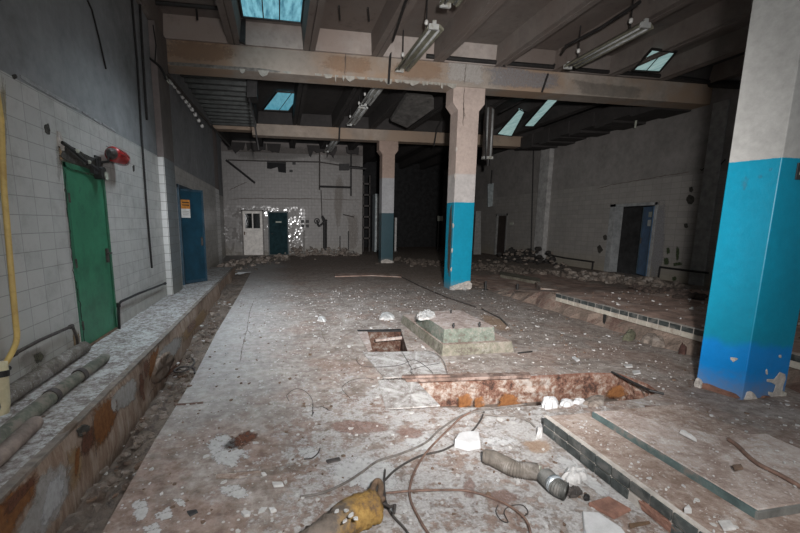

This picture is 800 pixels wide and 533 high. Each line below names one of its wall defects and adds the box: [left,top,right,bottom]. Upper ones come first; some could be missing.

rust [458,394,485,408]
rust [498,393,521,407]
spalling [694,372,787,400]
rust [66,397,118,491]
rust [0,473,39,533]